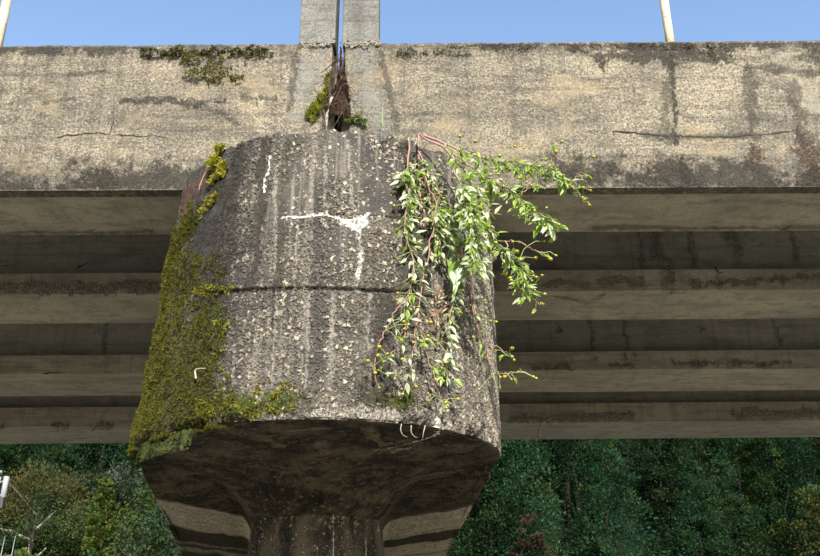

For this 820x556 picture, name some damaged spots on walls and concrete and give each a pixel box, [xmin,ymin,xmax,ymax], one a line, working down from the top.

damp [0,47,154,57]
damp [473,43,539,52]
damp [551,42,820,145]
damp [119,95,222,112]
crack [613,130,790,138]
damp [533,148,789,187]
damp [0,136,441,487]